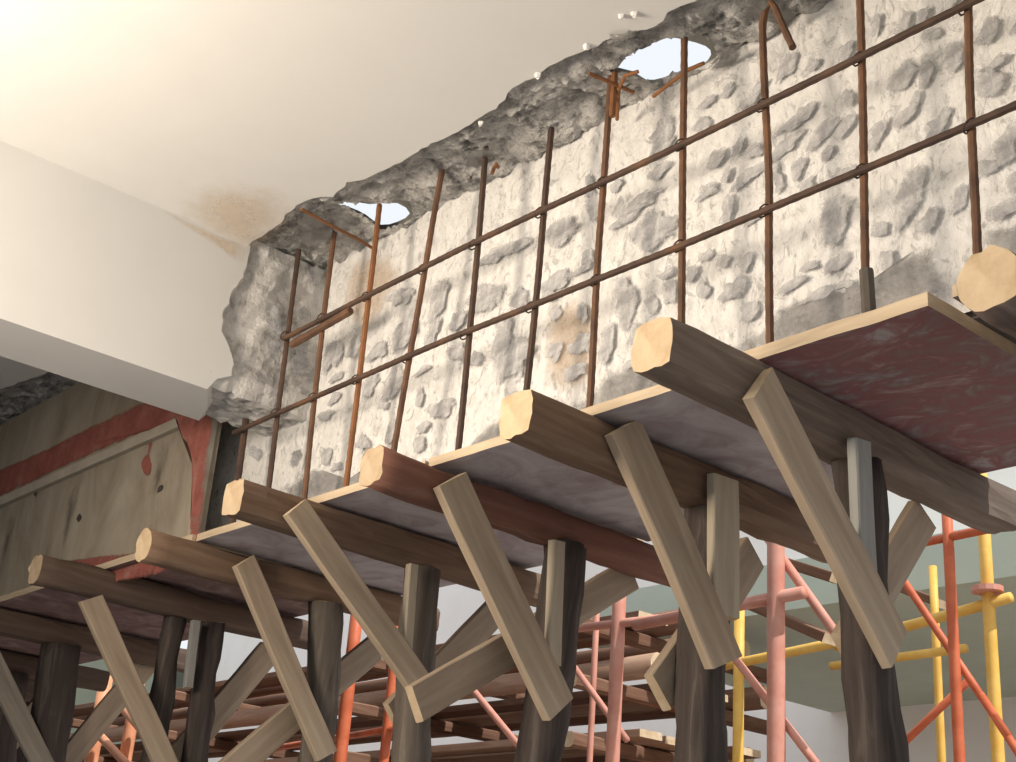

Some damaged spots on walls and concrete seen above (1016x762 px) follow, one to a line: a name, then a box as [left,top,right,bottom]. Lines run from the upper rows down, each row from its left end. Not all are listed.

spalling [205,0,1016,499]
rust [357,267,388,308]
spalling [0,372,79,425]